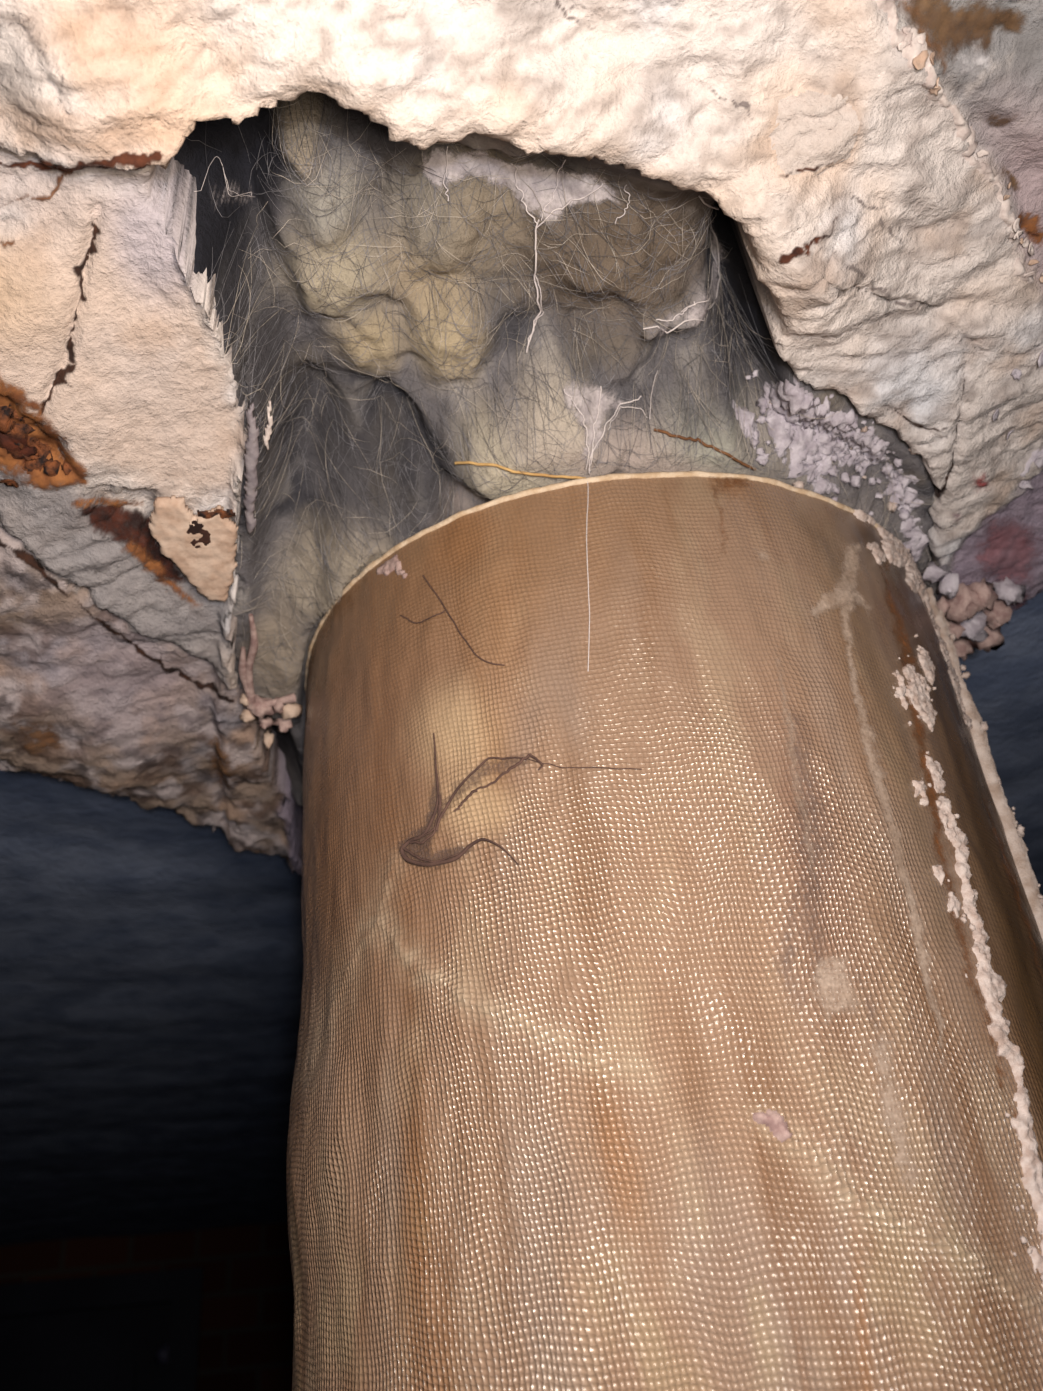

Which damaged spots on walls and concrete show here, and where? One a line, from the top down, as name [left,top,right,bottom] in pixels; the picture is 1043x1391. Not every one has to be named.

crack [0,143,162,201]
crack [41,222,100,414]
corrosion [0,381,195,602]
crack [0,539,234,703]
flaking render [149,495,239,602]